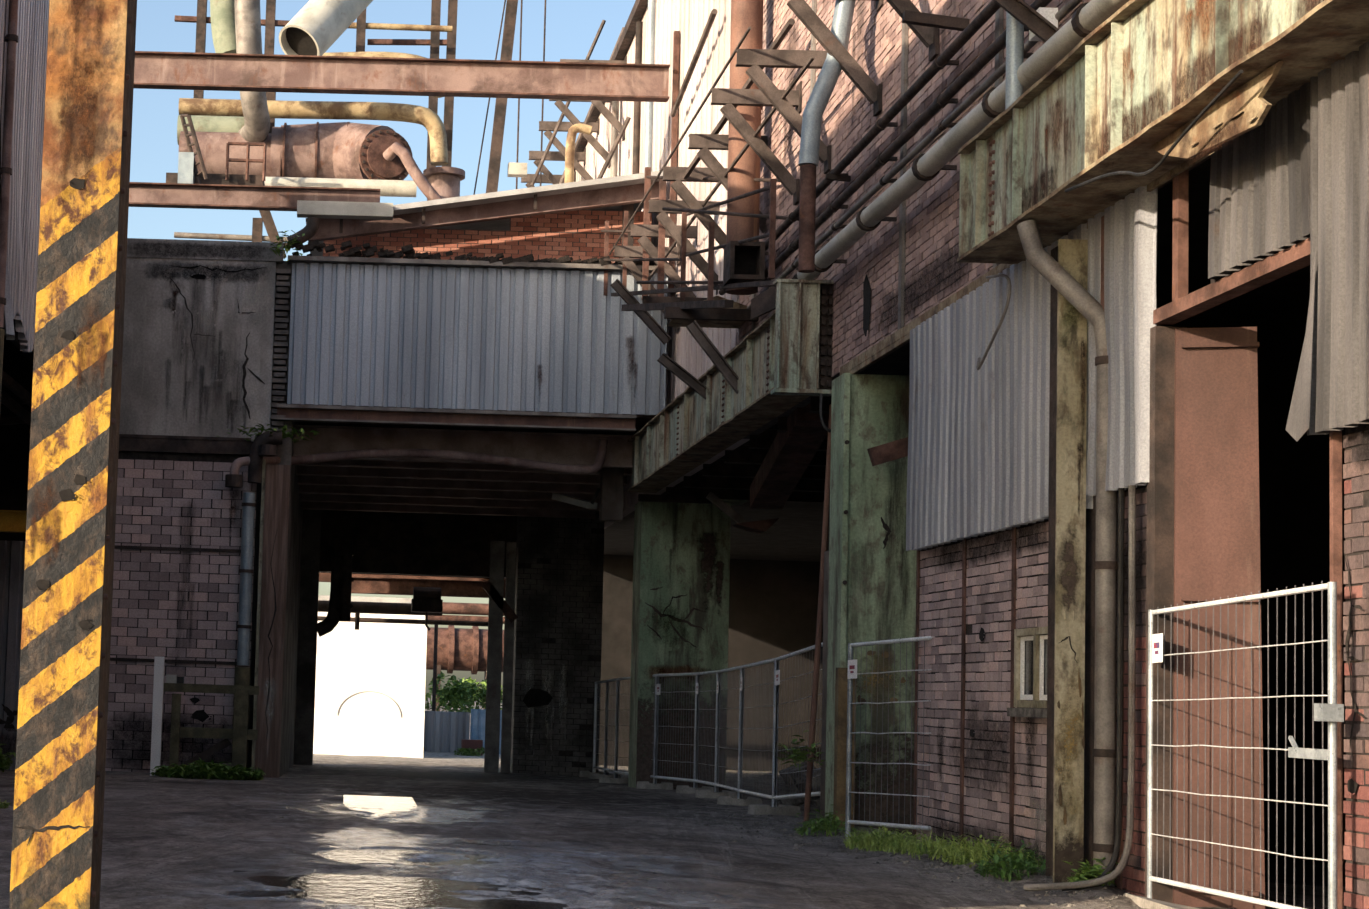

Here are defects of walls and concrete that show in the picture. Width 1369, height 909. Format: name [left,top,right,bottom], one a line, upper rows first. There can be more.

rust [1297,0,1324,15]
rust [60,57,96,172]
rust [1021,99,1068,213]
rust [1098,0,1267,159]
crack [169,265,267,419]
crack [646,587,708,647]
damp [697,532,724,614]